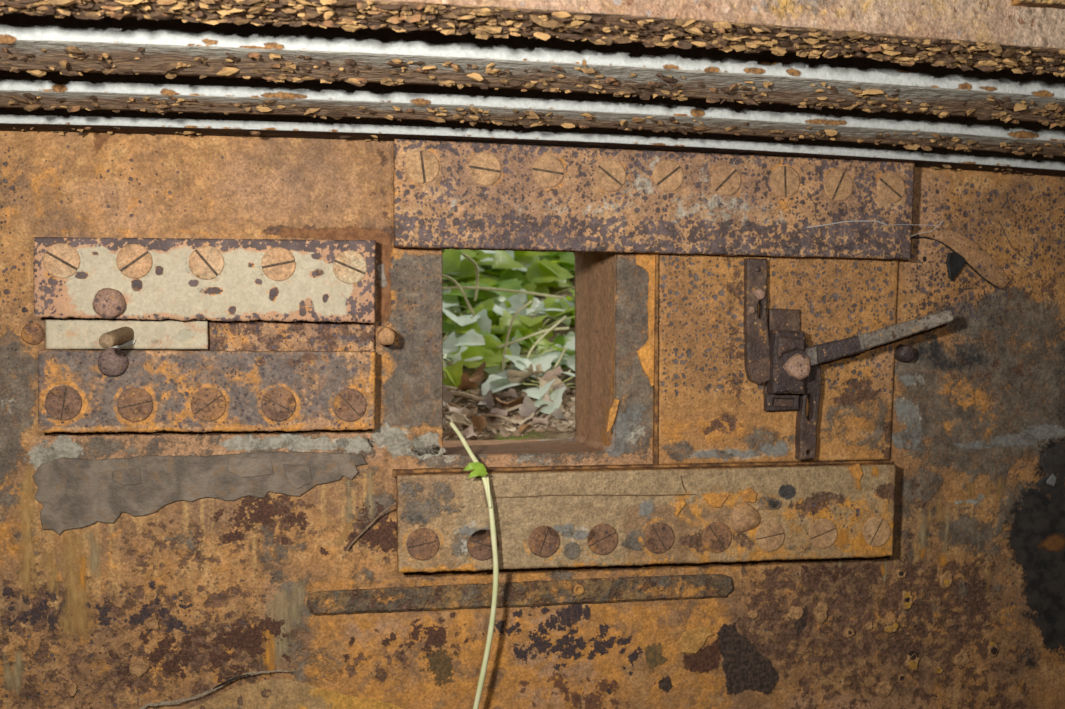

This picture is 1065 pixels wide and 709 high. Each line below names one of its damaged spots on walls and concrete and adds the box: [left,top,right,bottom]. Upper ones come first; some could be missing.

corrosion [280,227,392,322]
peeling [32,451,367,535]
corrosion [210,494,309,545]
corrosion [343,501,397,559]
corrosion [2,586,72,635]
corrosion [85,580,298,687]
corrosion [374,612,469,692]
corrosion [482,603,643,709]
corrosion [786,601,829,626]
corrosion [876,650,921,698]
corrosion [896,569,914,612]